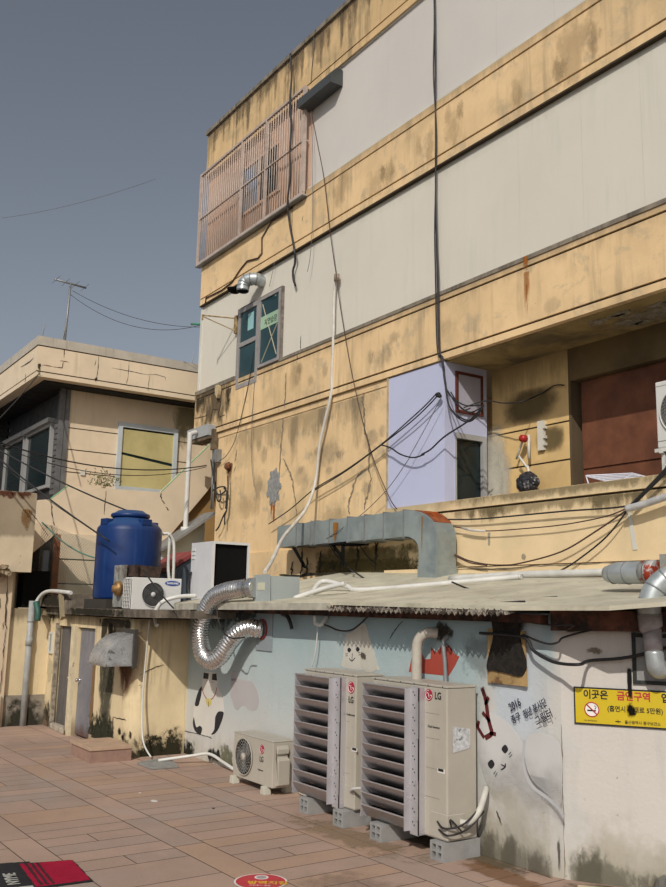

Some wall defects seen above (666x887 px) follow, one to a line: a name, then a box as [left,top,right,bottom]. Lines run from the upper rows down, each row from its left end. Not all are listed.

spalling [266,468,282,506]
spalling [0,564,12,577]
leakage [6,699,49,727]
leakage [88,666,128,742]
leakage [136,727,193,757]
leakage [208,746,233,766]